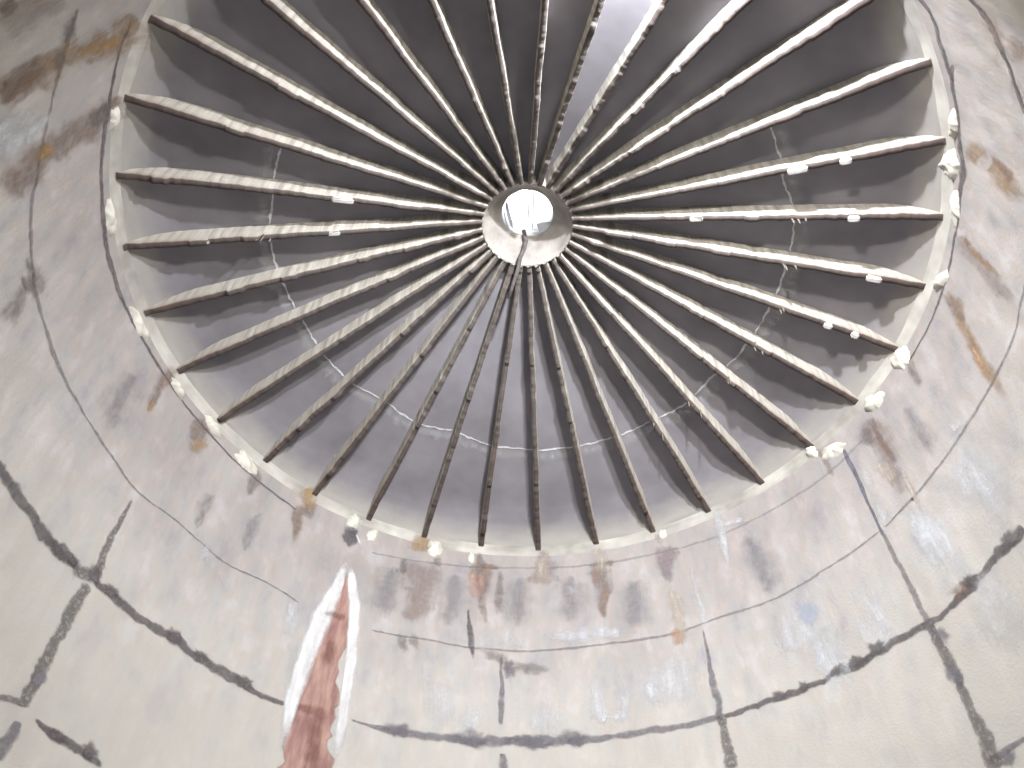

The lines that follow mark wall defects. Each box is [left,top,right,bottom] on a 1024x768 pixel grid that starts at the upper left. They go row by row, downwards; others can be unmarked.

rust [1,16,138,102]
rust [11,97,120,192]
crack [268,127,796,451]
rust [948,298,992,375]
crack [0,461,78,567]
crack [502,287,1024,661]
crack [95,580,284,705]
crack [353,525,1024,749]
crack [36,720,101,766]
crack [997,737,1024,764]